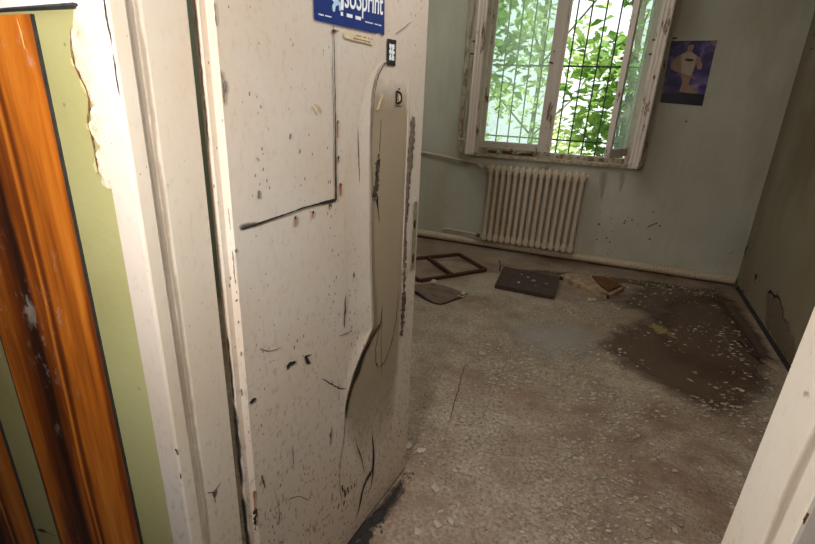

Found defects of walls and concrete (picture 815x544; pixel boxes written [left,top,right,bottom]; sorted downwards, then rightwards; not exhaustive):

spalling [70,5,112,189]
damp [601,277,770,411]
peeling [765,290,796,365]